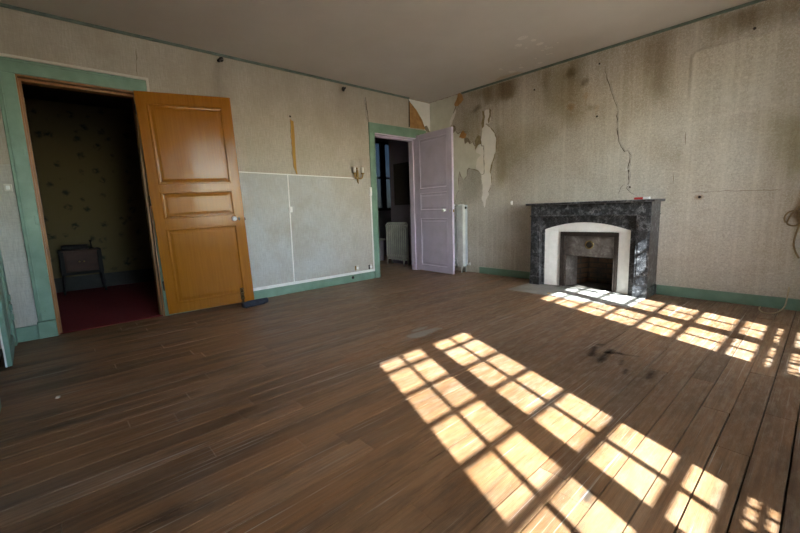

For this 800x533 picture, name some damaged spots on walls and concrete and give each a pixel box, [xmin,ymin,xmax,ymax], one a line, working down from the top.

flaking render [409,95,481,202]
crack [605,72,635,195]